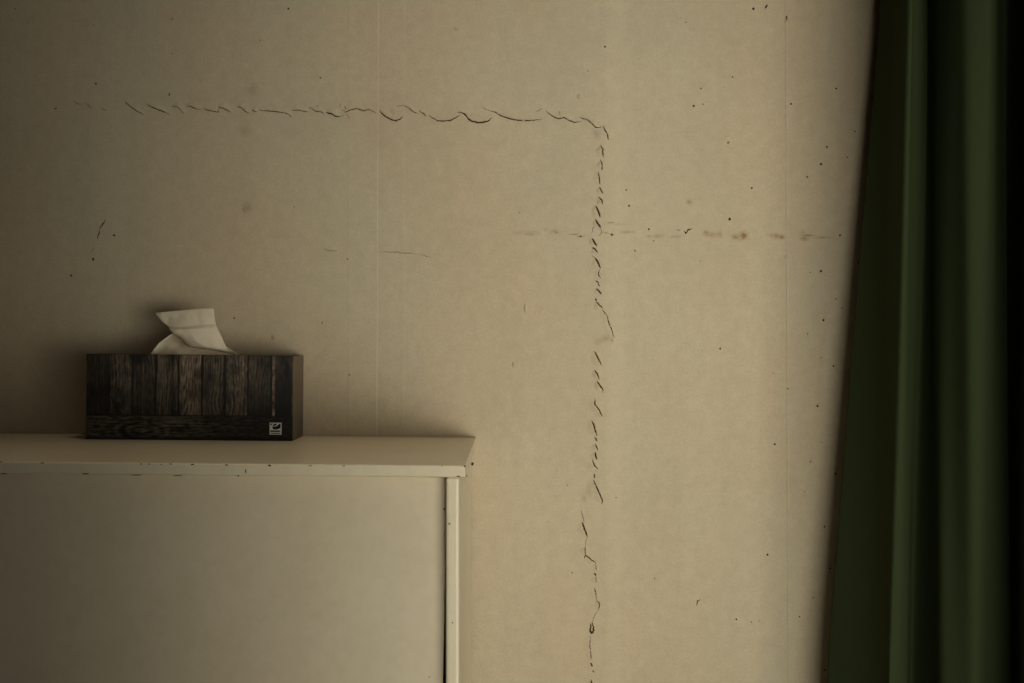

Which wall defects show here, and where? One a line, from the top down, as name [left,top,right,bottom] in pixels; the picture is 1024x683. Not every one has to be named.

crack [54,100,616,683]